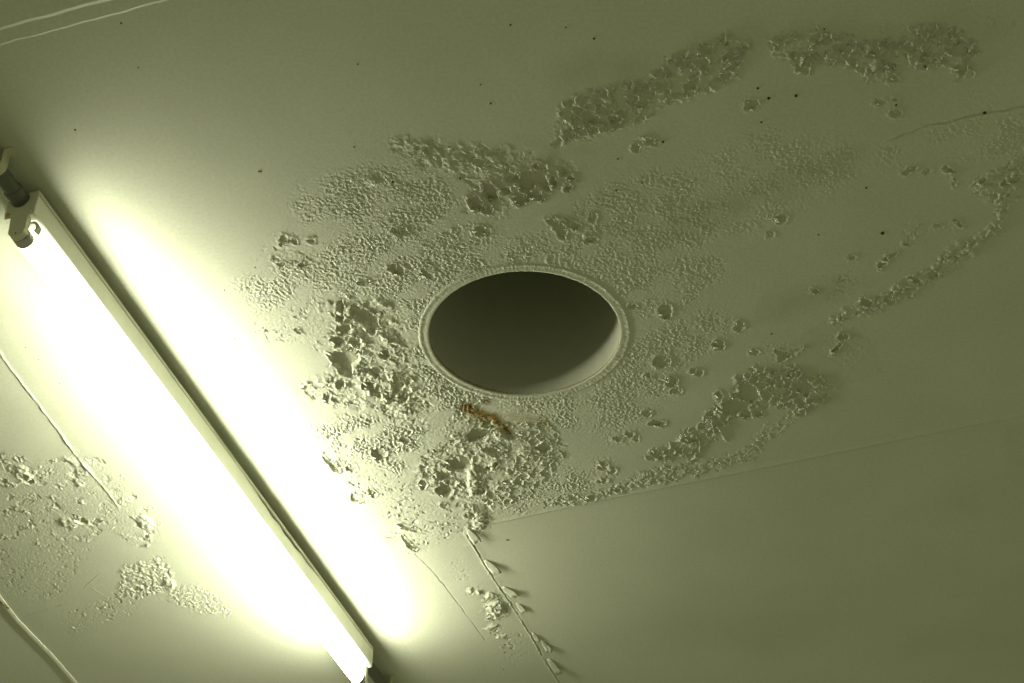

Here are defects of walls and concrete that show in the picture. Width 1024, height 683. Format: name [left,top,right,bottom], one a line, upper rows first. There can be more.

peeling [377,19,988,225]
spalling [253,225,319,266]
peeling [825,146,1024,328]
rust [431,346,511,434]
spalling [242,288,845,566]
peeling [0,449,243,621]
crack [419,558,487,643]
crack [466,529,568,683]